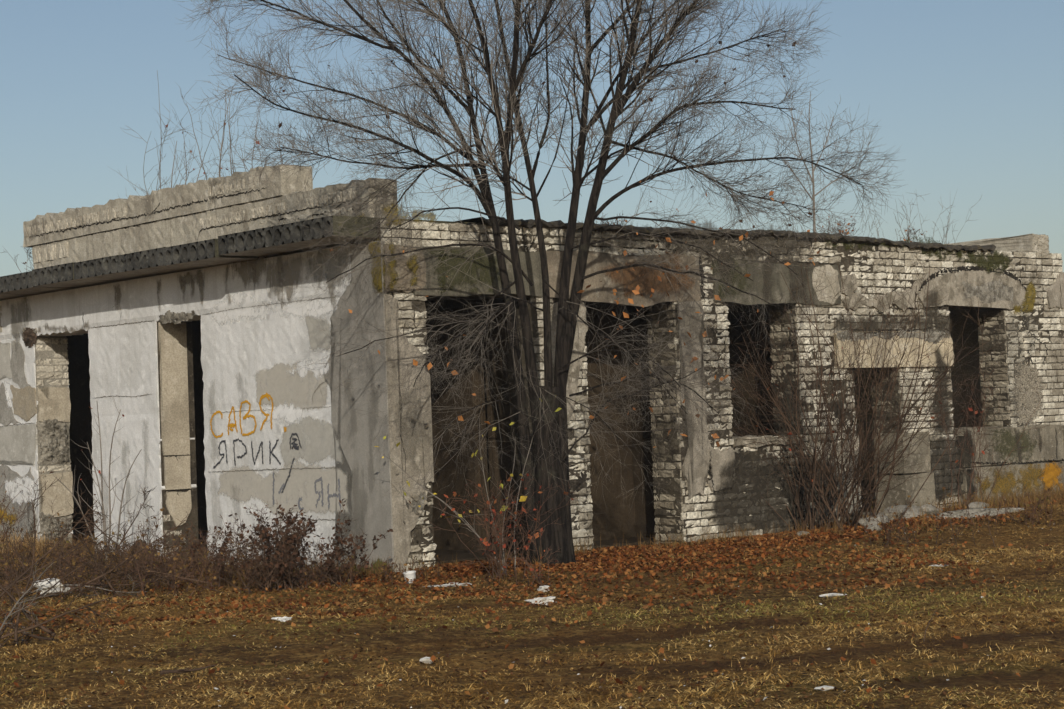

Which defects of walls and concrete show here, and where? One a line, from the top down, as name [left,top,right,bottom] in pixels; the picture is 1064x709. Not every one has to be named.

water stain [179,270,204,303]
water stain [226,248,349,308]
spalling [159,310,195,324]
peeling [0,305,73,545]
peeling [211,291,349,517]